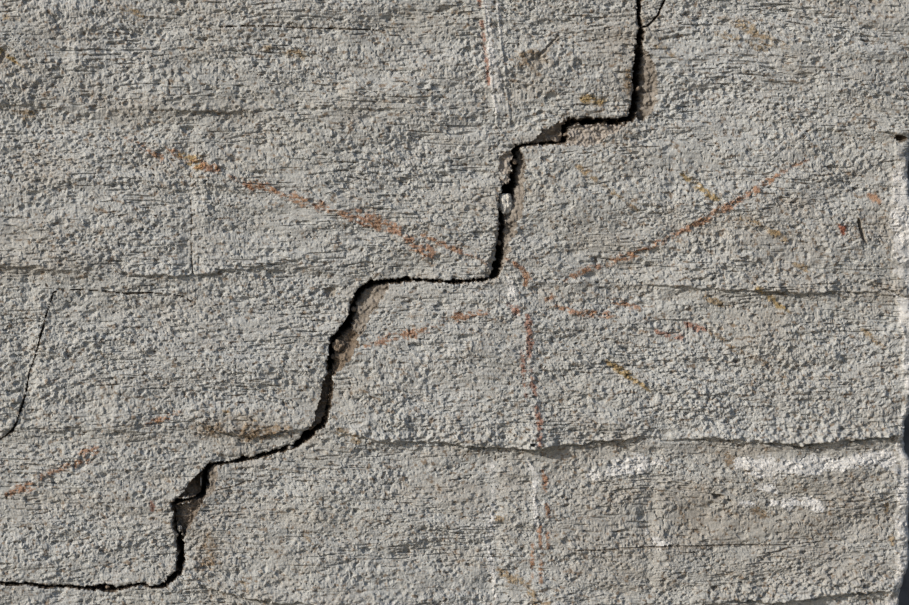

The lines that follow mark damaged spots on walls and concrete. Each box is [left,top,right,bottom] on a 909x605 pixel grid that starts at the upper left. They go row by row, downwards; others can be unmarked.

crack [0,0,666,593]